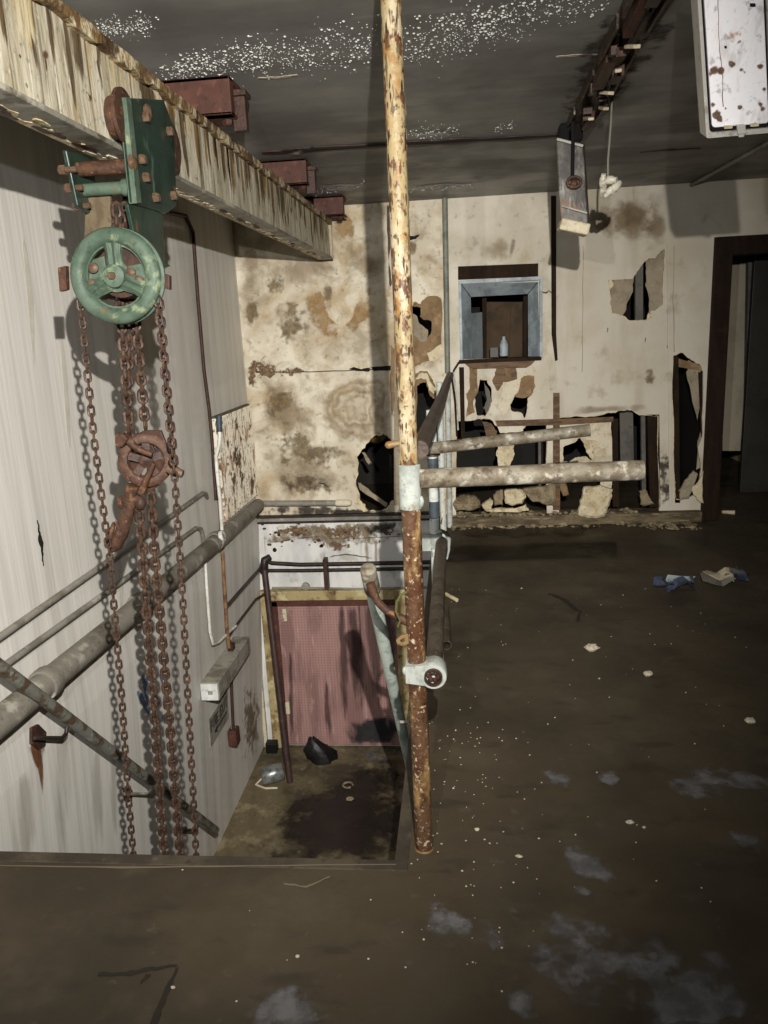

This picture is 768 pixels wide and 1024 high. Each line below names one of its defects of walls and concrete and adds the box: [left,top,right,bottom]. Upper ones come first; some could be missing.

corrosion [710,10,745,122]
leakage [337,216,354,237]
leakage [247,303,258,323]
leakage [281,288,368,337]
spalling [248,1,443,590]
spalling [608,249,665,321]
leakage [271,393,291,416]
leakage [281,476,330,493]
leakage [282,433,343,465]
spalling [466,367,536,466]
spalling [546,409,660,506]
spalling [667,345,704,474]